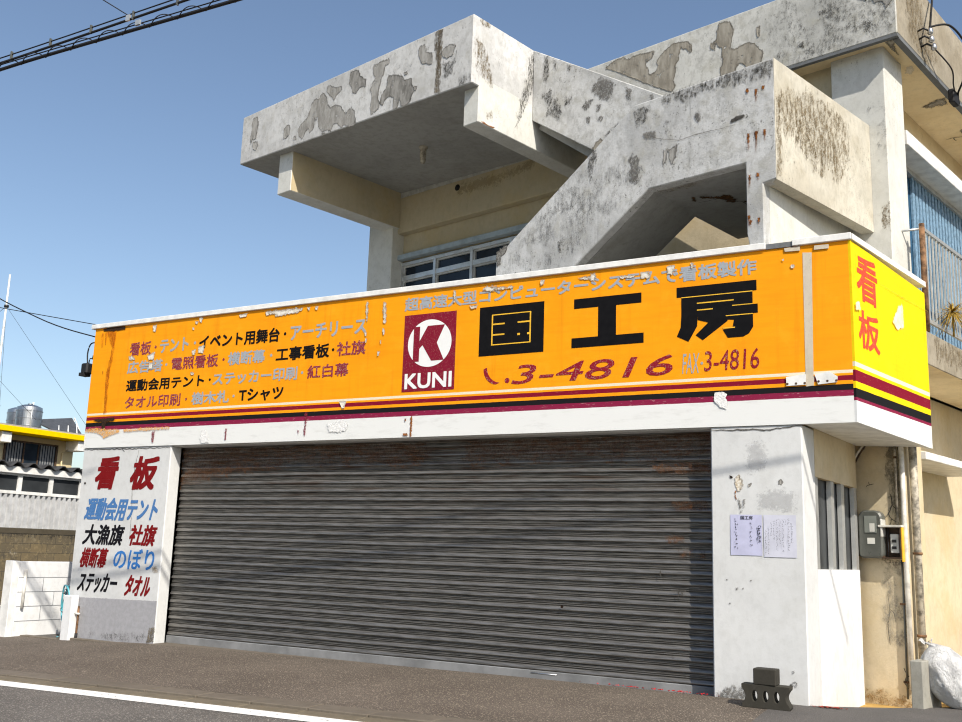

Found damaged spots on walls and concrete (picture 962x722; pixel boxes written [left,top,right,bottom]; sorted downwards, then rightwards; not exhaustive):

peeling [283,58,417,140]
peeling [606,41,692,92]
damp [634,54,785,139]
peeling [710,21,764,75]
damp [788,0,891,61]
damp [923,98,947,108]
damp [775,88,849,183]
spalling [729,475,752,492]